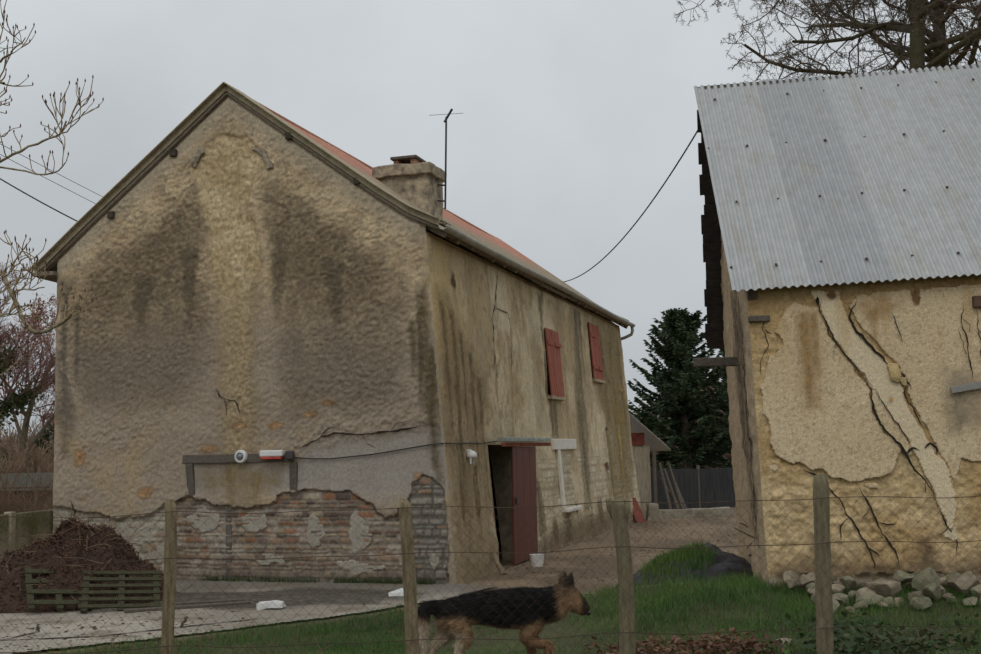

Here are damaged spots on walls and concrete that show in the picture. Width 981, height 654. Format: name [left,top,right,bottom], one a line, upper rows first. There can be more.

crack [493,268,513,386]
crack [959,310,981,377]
crack [216,390,240,417]
crack [299,421,419,449]
flaking render [759,284,981,542]
crack [816,297,958,556]
flaking render [53,488,403,582]
flaking render [407,473,449,584]